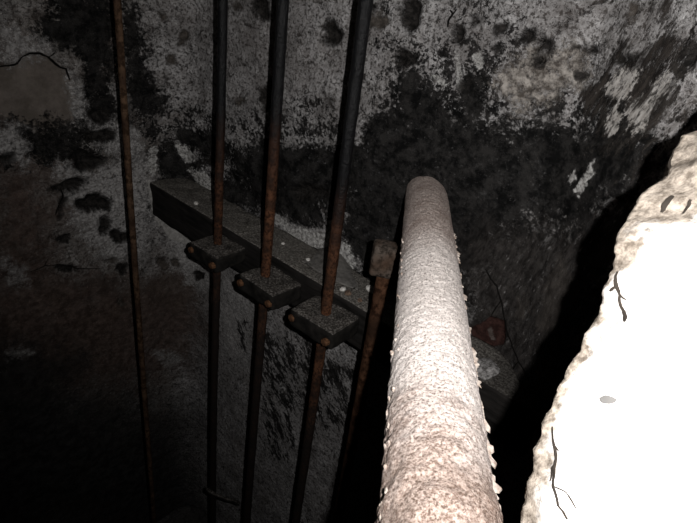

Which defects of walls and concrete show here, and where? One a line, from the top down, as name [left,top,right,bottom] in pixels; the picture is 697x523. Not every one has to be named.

damp [0,26,50,70]
crack [0,52,70,80]
damp [0,121,31,172]
damp [53,68,158,264]
crack [609,271,628,322]
crack [550,426,577,520]